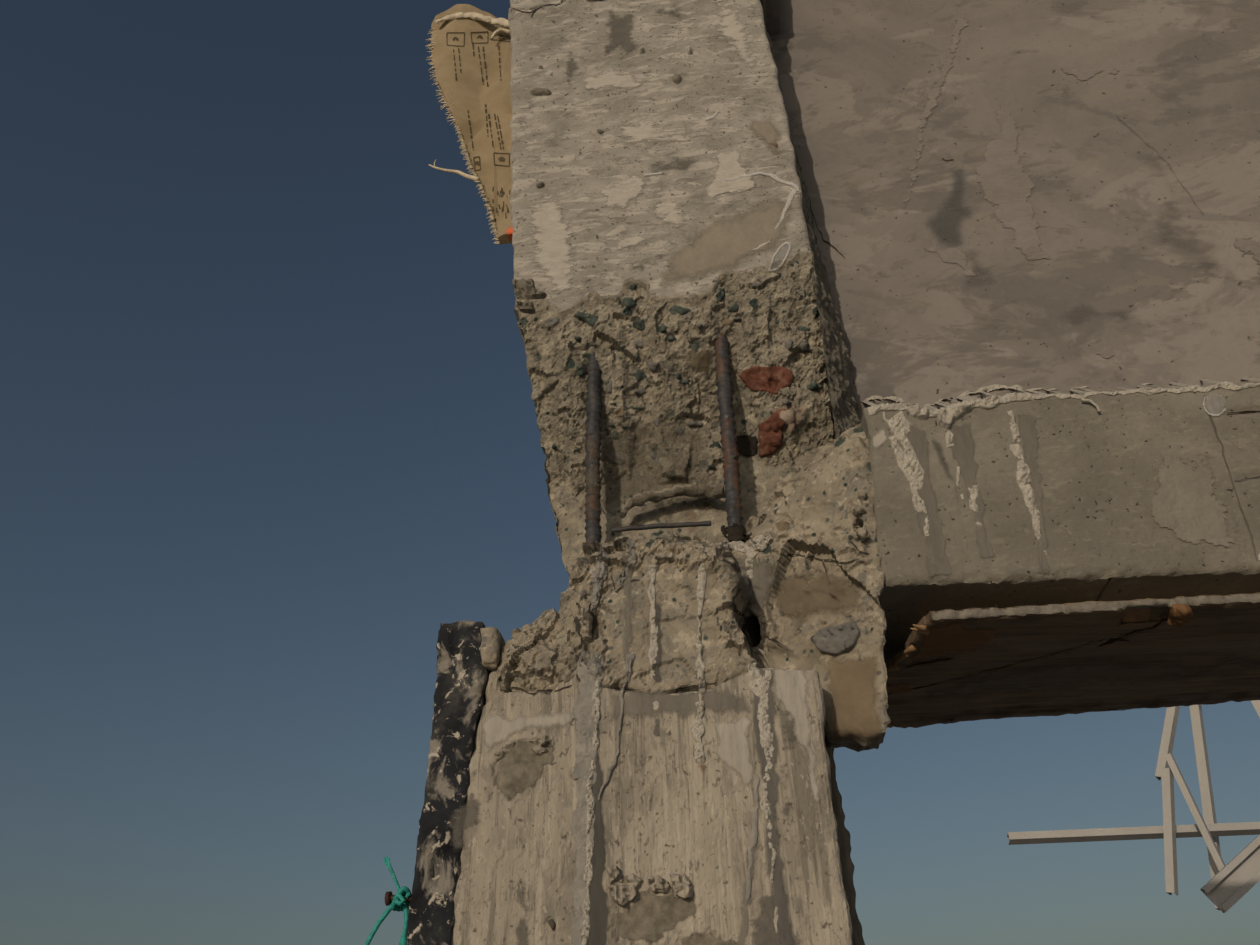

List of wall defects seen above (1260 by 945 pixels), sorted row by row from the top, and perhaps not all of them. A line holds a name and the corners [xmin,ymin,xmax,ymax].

crack [513,1,563,17]
leakage [927,176,985,280]
leakage [975,106,1051,261]
spalling [496,249,890,752]
leakage [858,376,1260,577]
crack [1204,395,1260,560]
leakage [482,533,819,945]